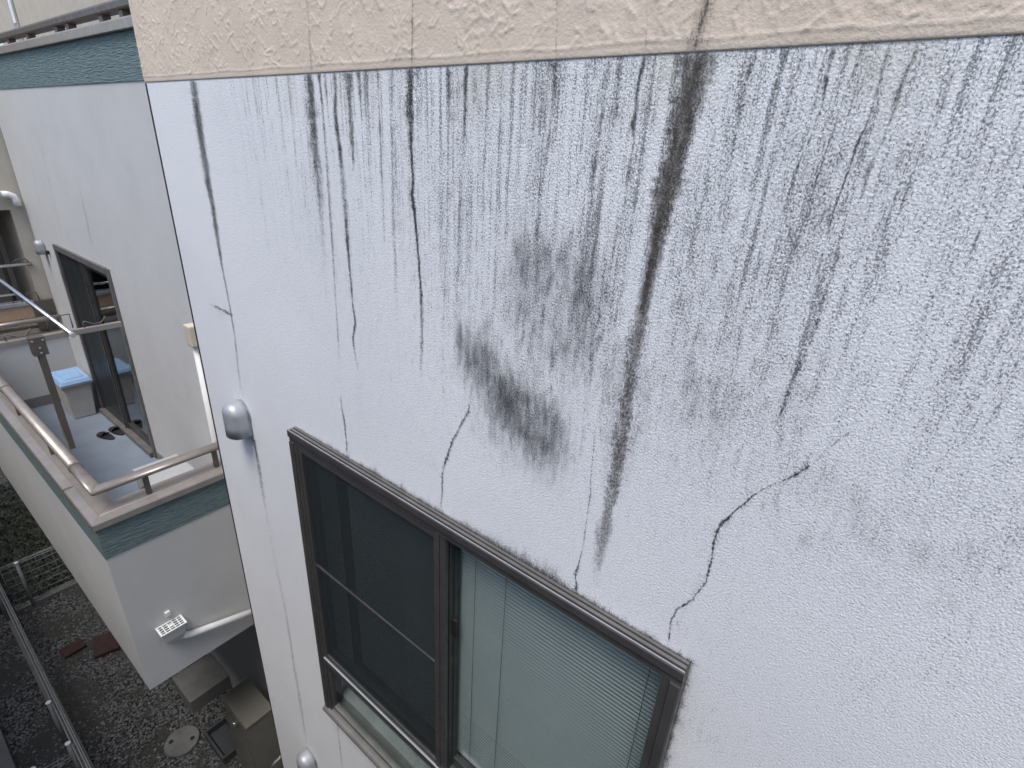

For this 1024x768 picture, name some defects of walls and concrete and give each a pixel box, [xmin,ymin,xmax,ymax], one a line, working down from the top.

water stain [190,80,234,332]
water stain [304,73,362,347]
water stain [406,68,423,343]
crack [441,406,470,499]
water stain [463,66,476,136]
water stain [456,323,565,469]
water stain [513,234,599,365]
water stain [597,53,716,554]
crack [668,439,839,638]
water stain [828,48,889,228]